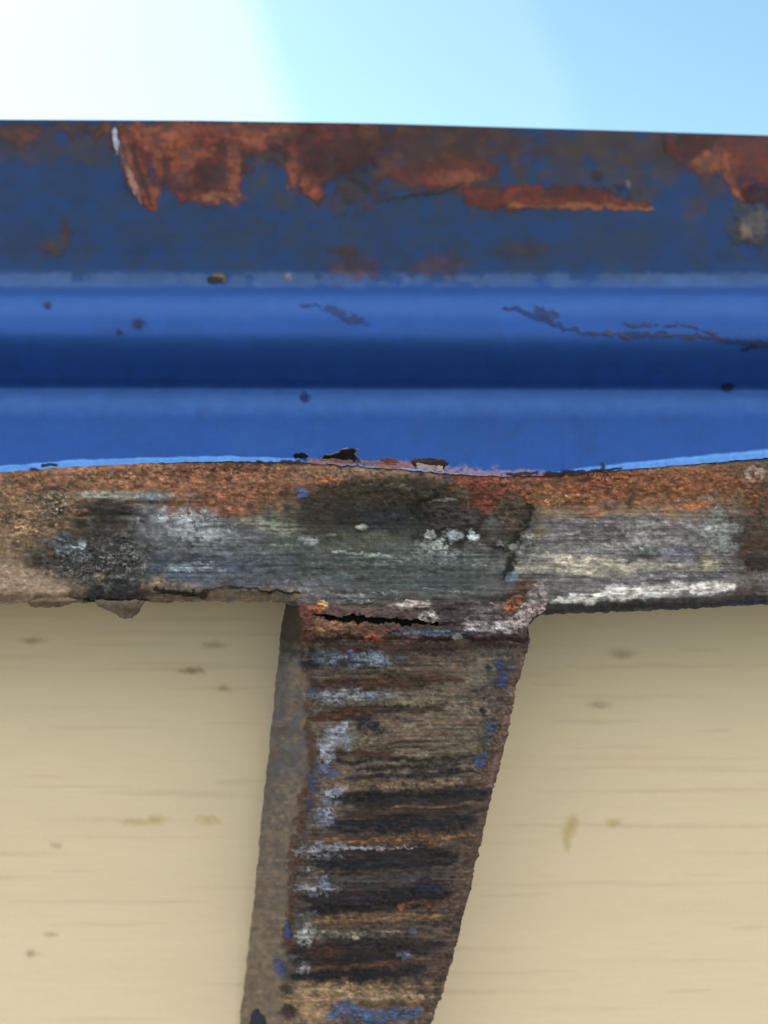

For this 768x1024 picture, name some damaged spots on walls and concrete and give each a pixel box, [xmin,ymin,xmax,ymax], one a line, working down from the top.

rust [80,120,653,211]
rust [663,133,768,205]
leakage [71,499,144,543]
rust [0,461,299,558]
leakage [285,478,458,546]
peeling [28,483,744,639]
leakage [509,526,546,581]
rust [465,464,768,516]
crack [153,585,462,629]